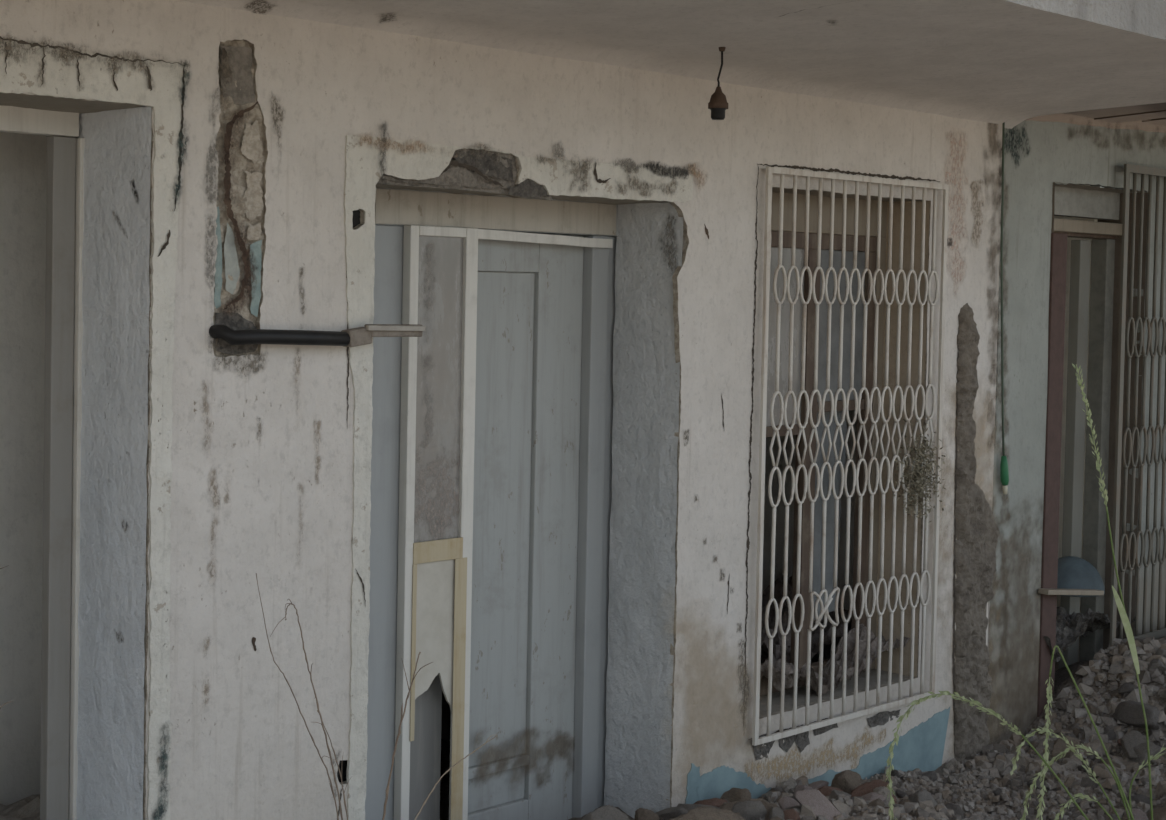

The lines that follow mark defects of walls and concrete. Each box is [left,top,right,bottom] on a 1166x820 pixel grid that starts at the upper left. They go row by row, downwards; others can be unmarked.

flaking render [213,40,265,357]
spalling [453,150,549,198]
peeling [685,707,950,804]